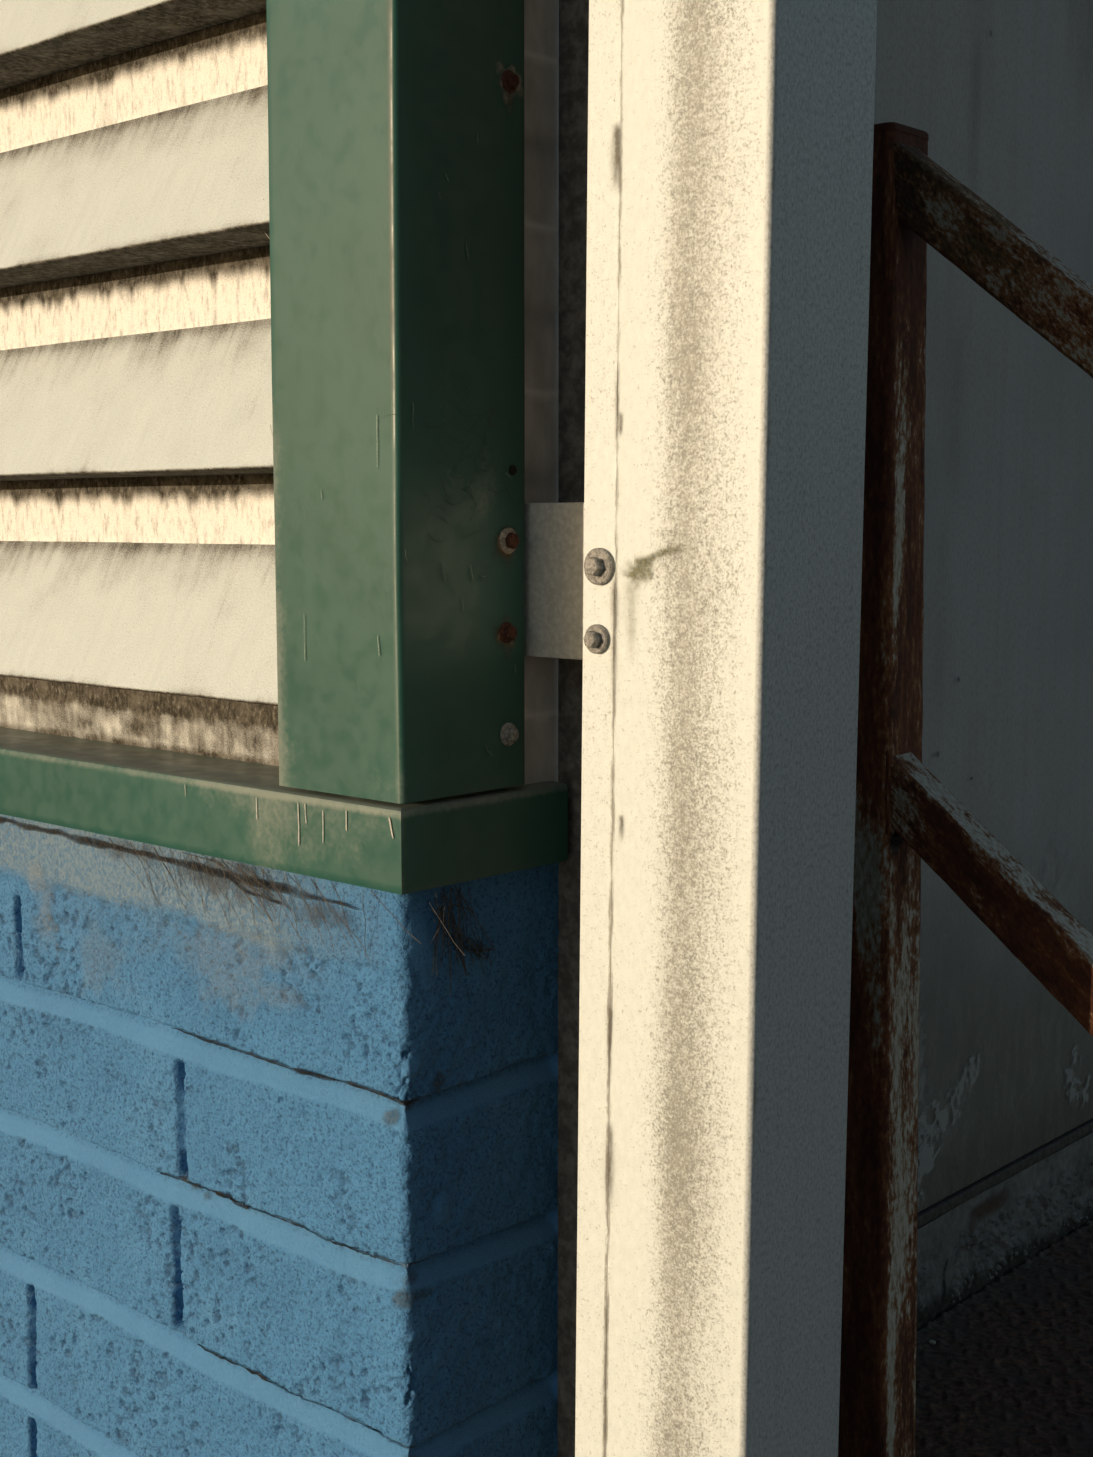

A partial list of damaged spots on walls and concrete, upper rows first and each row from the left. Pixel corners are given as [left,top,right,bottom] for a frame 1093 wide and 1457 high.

water stain [0,815,278,945]
peeling [918,1055,980,1202]
water stain [918,984,1093,1212]